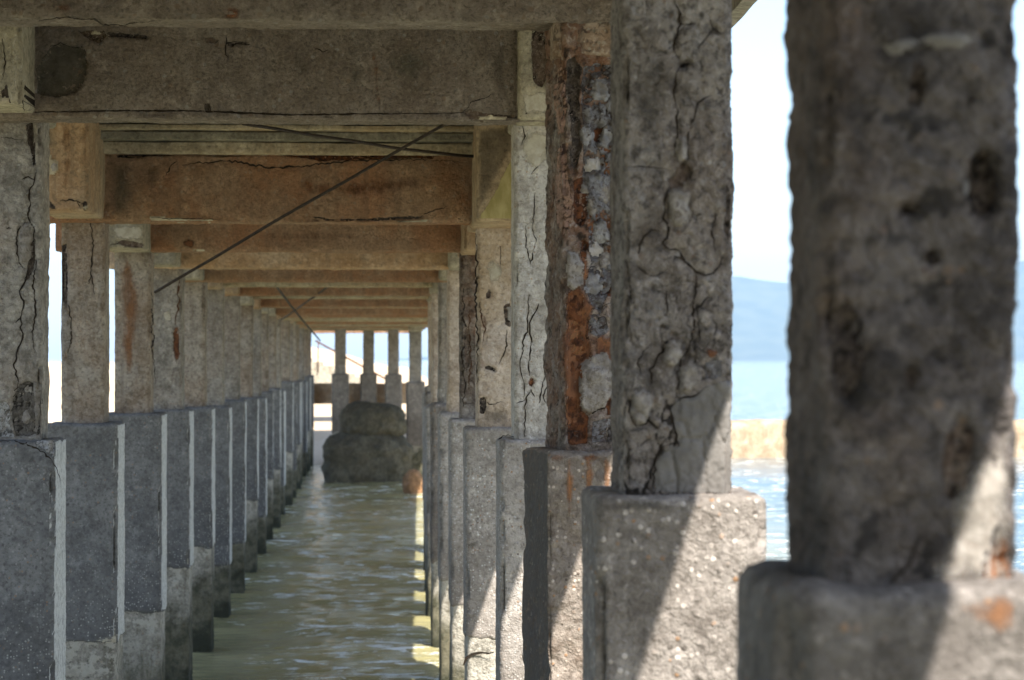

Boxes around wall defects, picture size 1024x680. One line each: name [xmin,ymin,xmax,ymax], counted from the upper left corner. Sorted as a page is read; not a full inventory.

crack [166,158,460,176]